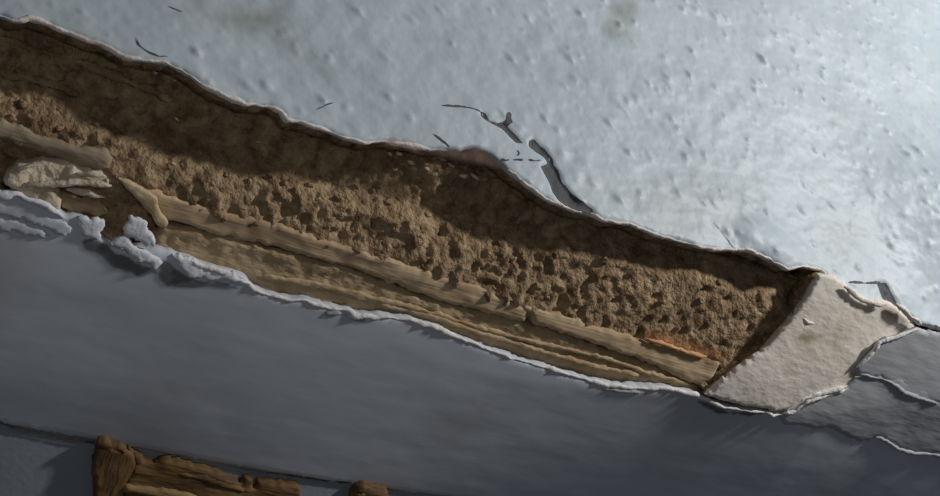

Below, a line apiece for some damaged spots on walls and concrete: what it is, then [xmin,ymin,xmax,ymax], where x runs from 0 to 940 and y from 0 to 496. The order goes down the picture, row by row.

spalling [0,14,848,418]
crack [441,104,593,214]
peeling [698,270,940,412]
peeling [779,375,940,458]